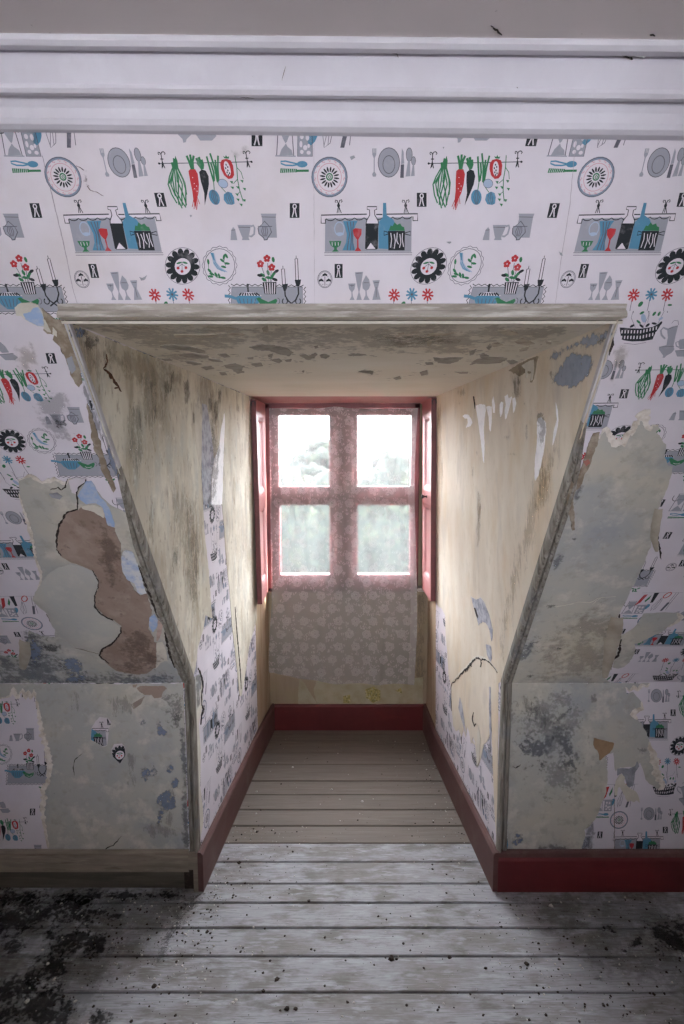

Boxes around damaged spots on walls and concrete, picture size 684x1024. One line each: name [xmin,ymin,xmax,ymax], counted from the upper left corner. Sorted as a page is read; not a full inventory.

crack [103,354,122,392]
peeling [134,325,377,375]
peeling [358,343,538,383]
peeling [463,394,516,462]
peeling [534,405,559,481]
peeling [576,432,600,490]
flaking render [49,403,168,709]
peeling [650,509,663,559]
peeling [471,597,493,662]
crack [451,655,497,711]
peeling [593,738,614,760]
peeling [614,762,640,803]